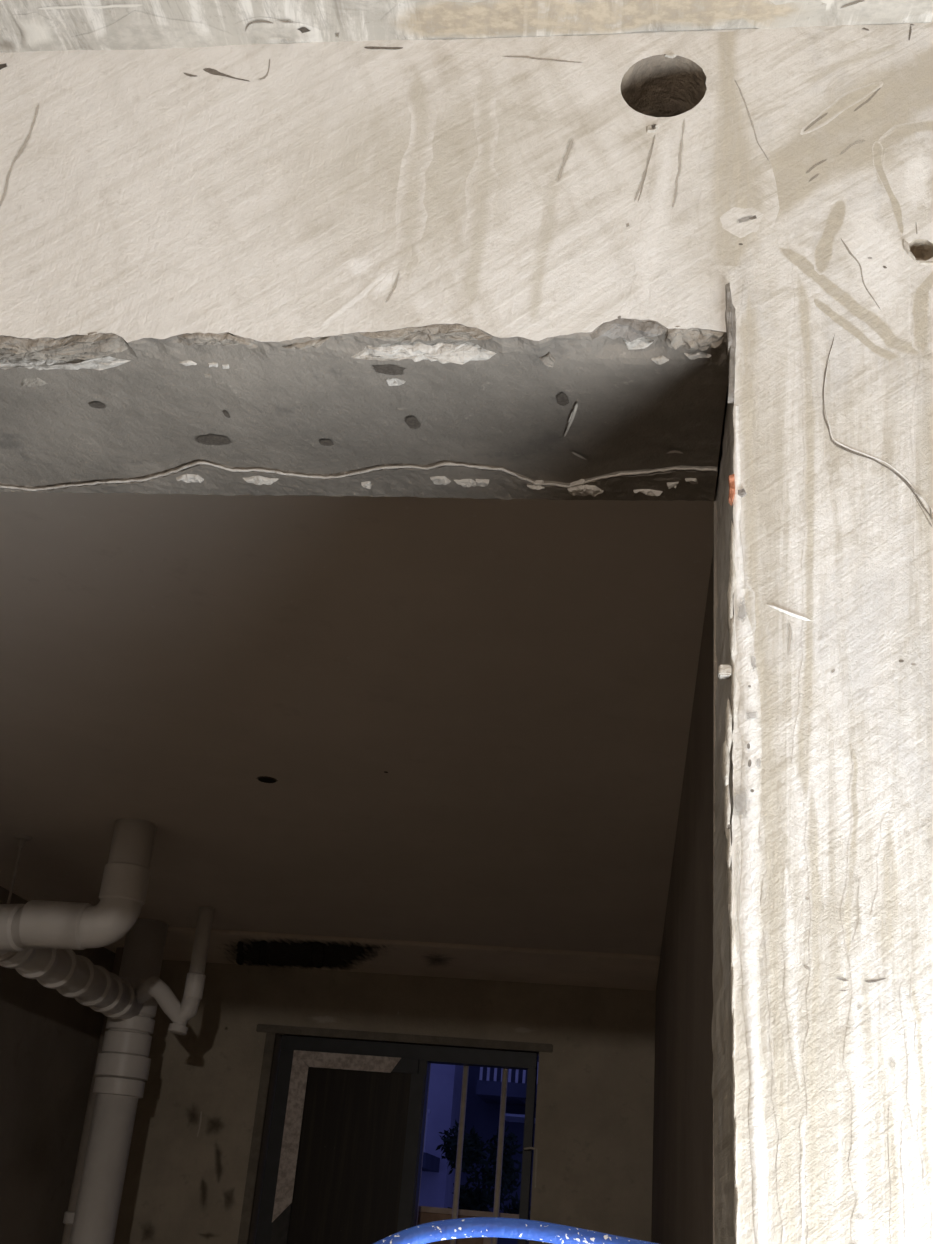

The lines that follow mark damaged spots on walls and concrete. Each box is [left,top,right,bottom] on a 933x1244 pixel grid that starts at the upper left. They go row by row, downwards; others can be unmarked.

spalling [0,283,769,1244]
crack [822,331,933,526]